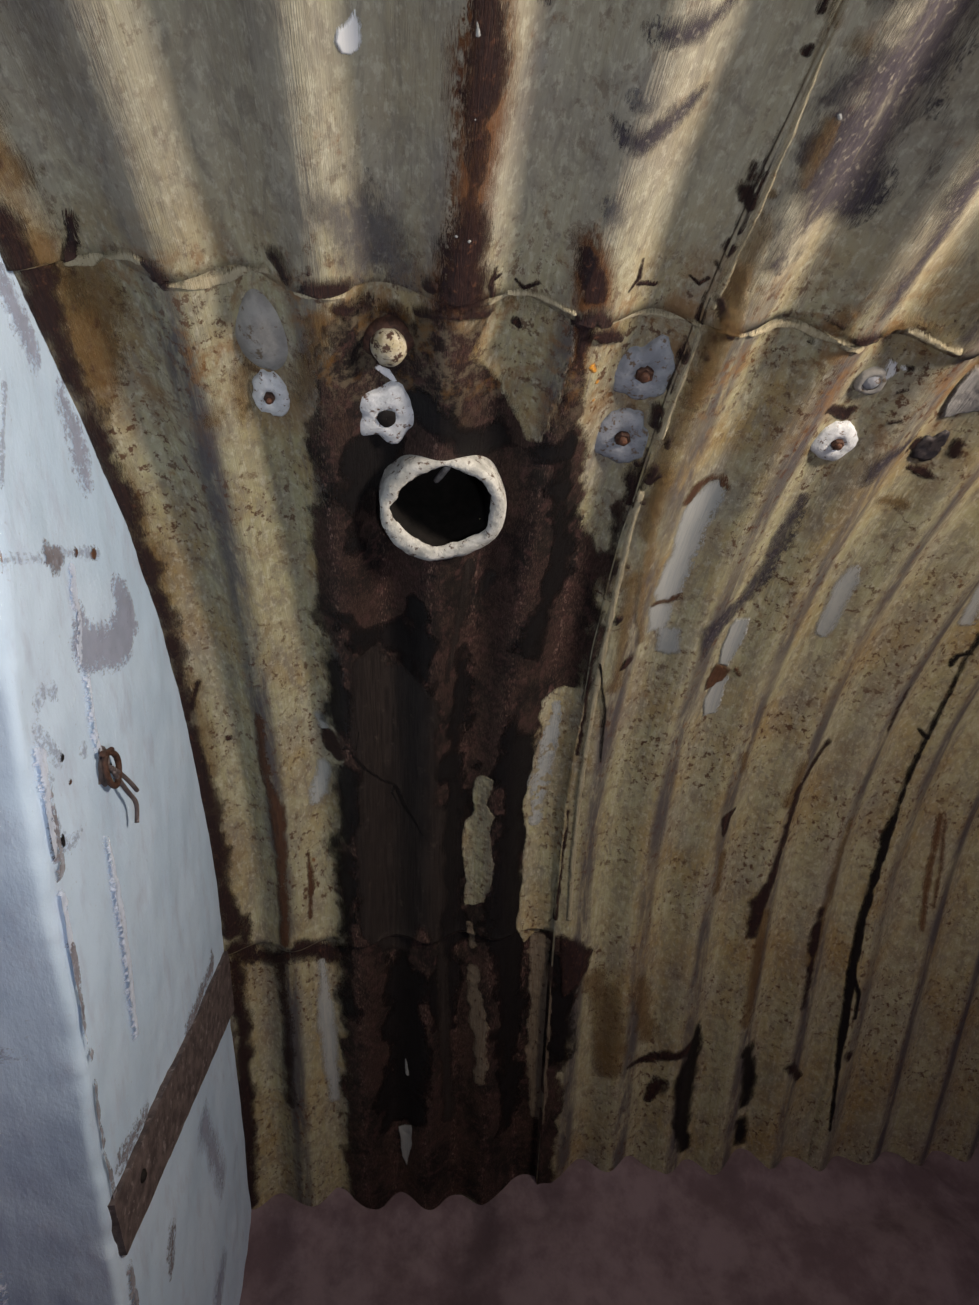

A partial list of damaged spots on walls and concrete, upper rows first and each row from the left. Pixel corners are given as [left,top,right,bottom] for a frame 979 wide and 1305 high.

leakage [0,263,41,373]
rust [0,0,783,1210]
peeling [516,0,865,1123]
peeling [904,327,963,356]
crack [828,633,979,1132]